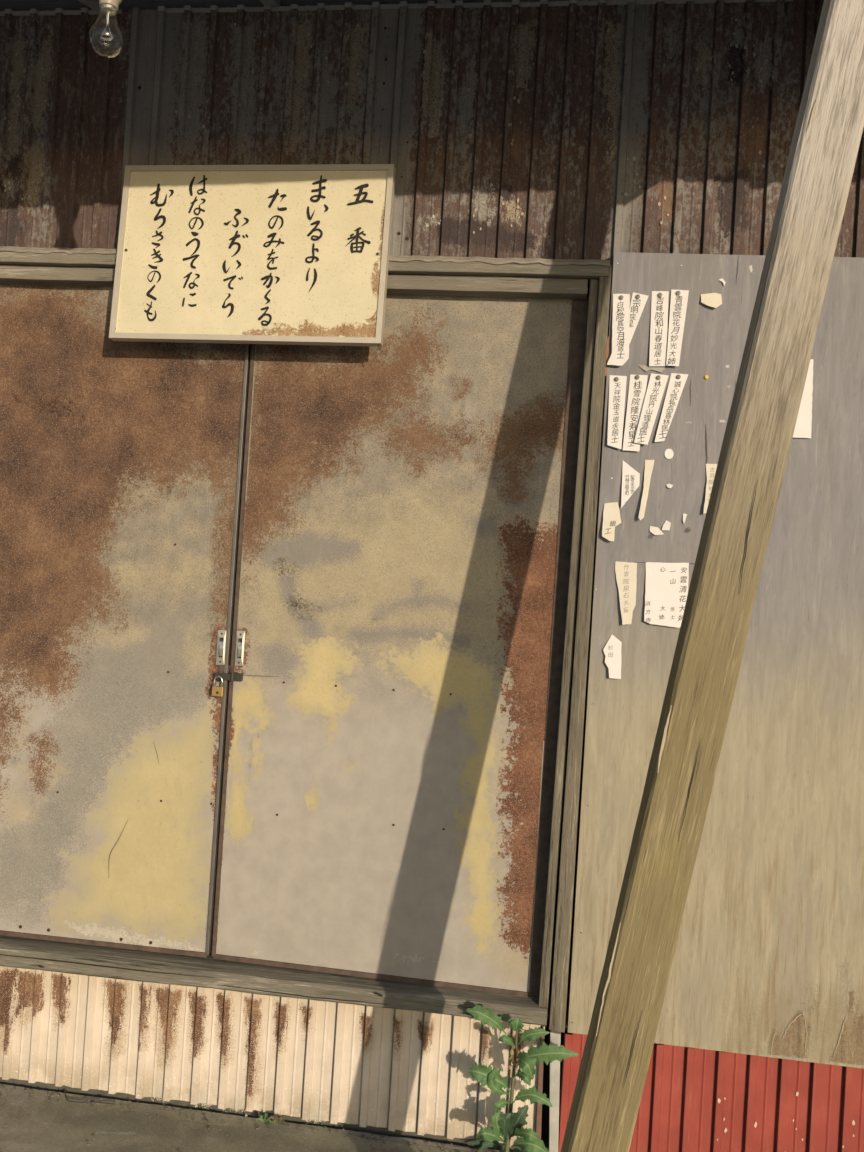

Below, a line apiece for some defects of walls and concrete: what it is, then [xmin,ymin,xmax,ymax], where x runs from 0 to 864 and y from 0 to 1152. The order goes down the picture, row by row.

peeling [0,34,47,214]
peeling [417,31,450,140]
rust [371,209,385,297]
peeling [417,214,441,231]
peeling [472,180,528,234]
rust [0,284,566,959]
rust [0,967,75,1056]
rust [101,978,316,1106]
rust [358,1009,436,1063]